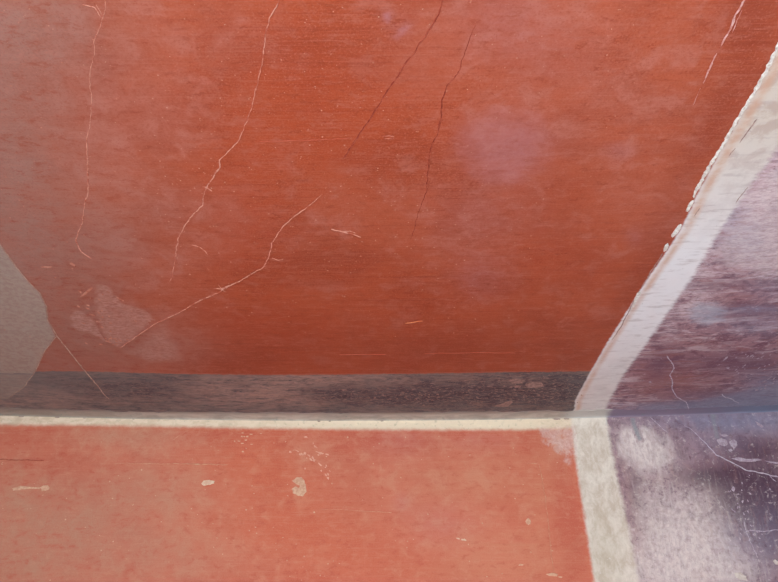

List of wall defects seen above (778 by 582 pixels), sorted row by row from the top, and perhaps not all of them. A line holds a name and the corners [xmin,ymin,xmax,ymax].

crack [75,0,106,258]
crack [170,0,280,281]
crack [344,0,443,157]
crack [410,27,475,240]
flaking render [0,243,58,400]
crack [120,197,319,348]
peeling [289,436,331,496]